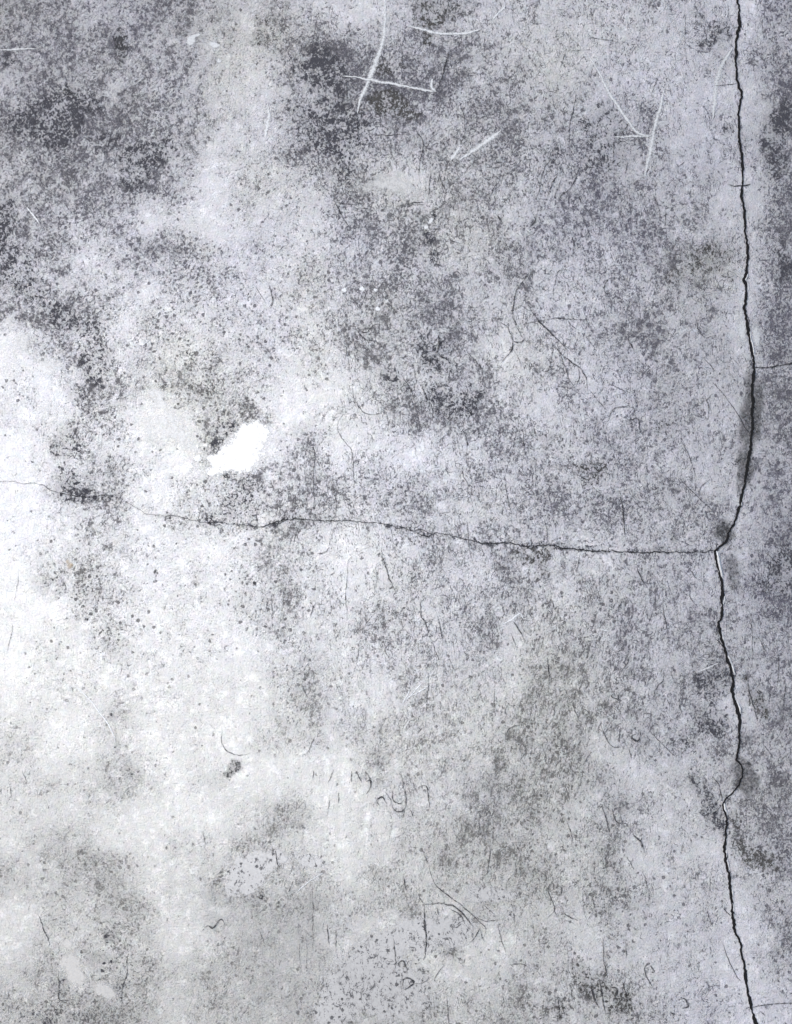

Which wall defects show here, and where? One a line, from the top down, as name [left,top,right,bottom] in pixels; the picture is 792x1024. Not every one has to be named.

crack [167,0,792,1024]